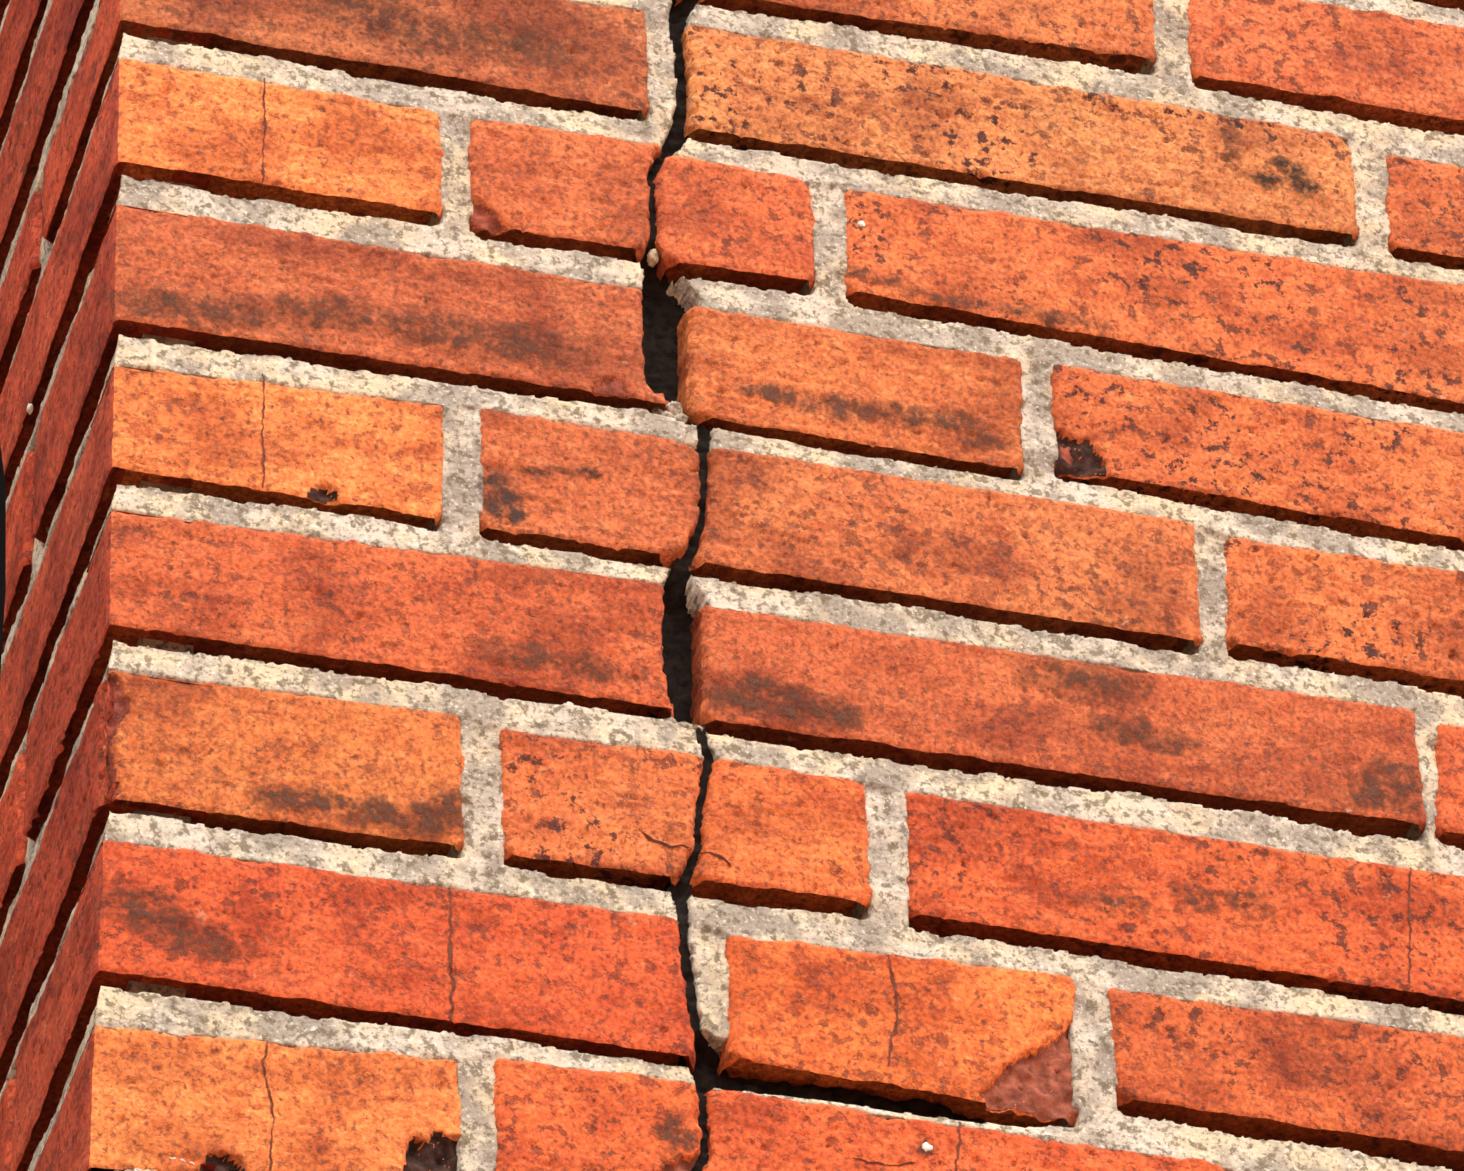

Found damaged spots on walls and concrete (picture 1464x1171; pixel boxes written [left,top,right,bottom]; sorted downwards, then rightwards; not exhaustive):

spalling [1054,431,1107,477]
crack [633,0,731,1171]
spalling [200,1154,245,1171]
crack [262,1040,275,1171]
spalling [403,1132,458,1171]
spalling [692,1020,1079,1125]